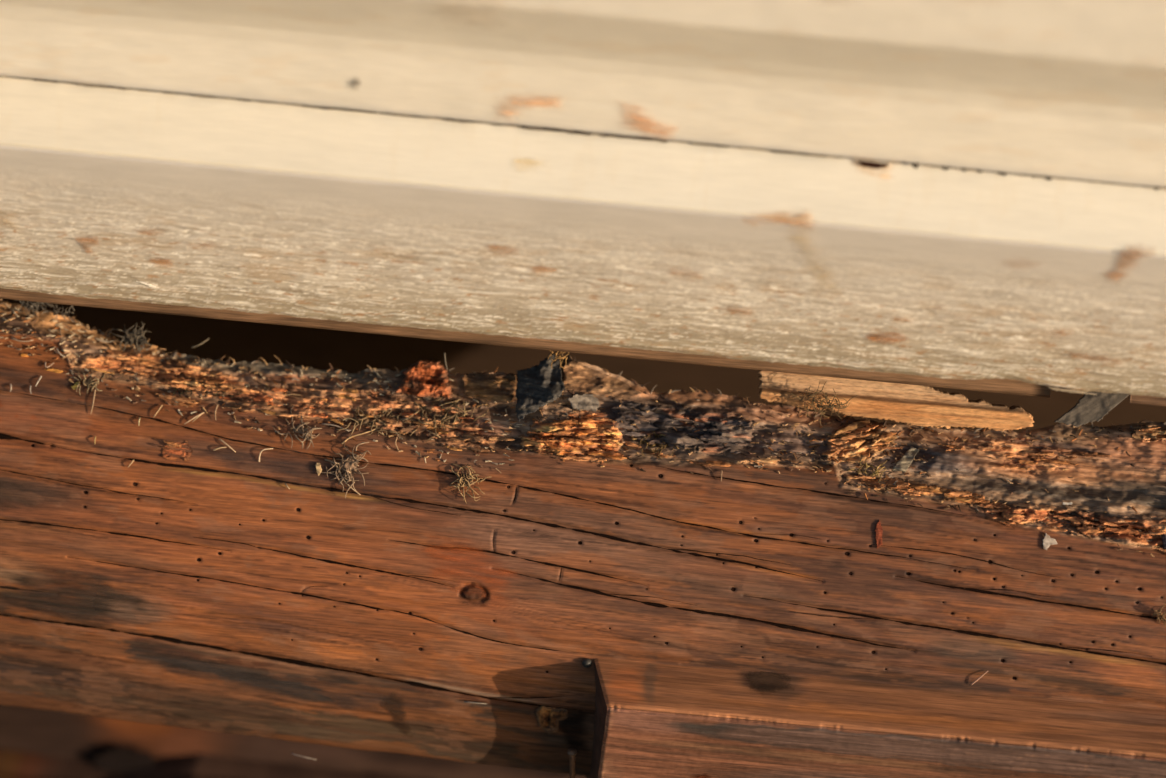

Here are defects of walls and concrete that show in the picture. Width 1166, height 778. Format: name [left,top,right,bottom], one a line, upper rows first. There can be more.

peeling [95,350,358,425]
peeling [488,412,667,462]
peeling [828,425,1011,509]
peeling [1001,446,1110,465]
crack [0,390,1166,665]
peeling [1021,519,1068,550]
peeling [1103,519,1166,553]
damp [0,577,143,621]
crack [0,586,583,711]